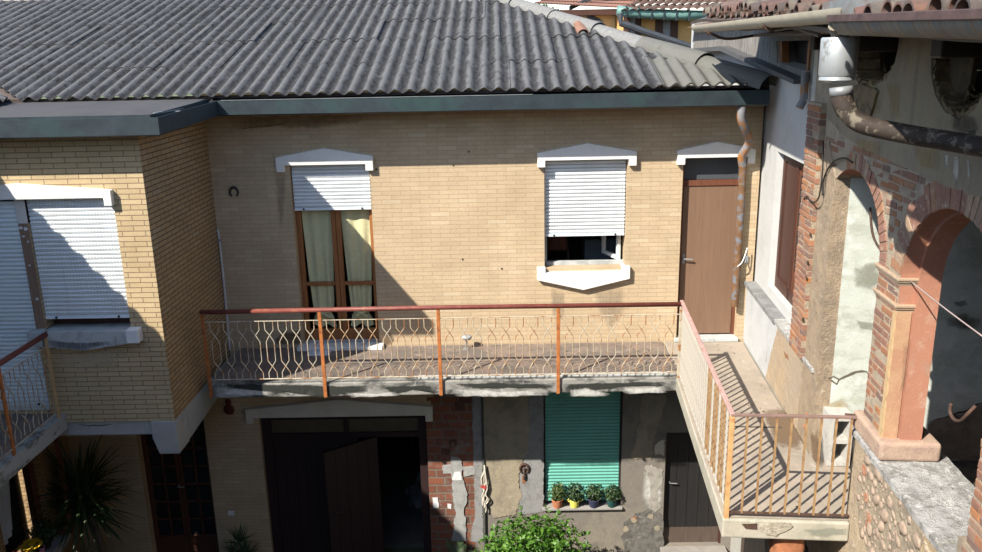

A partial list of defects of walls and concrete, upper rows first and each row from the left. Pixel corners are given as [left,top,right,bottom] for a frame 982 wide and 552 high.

spalling [853,52,894,117]
spalling [932,58,982,119]
damp [225,384,434,397]
damp [460,383,544,396]
damp [568,382,662,396]